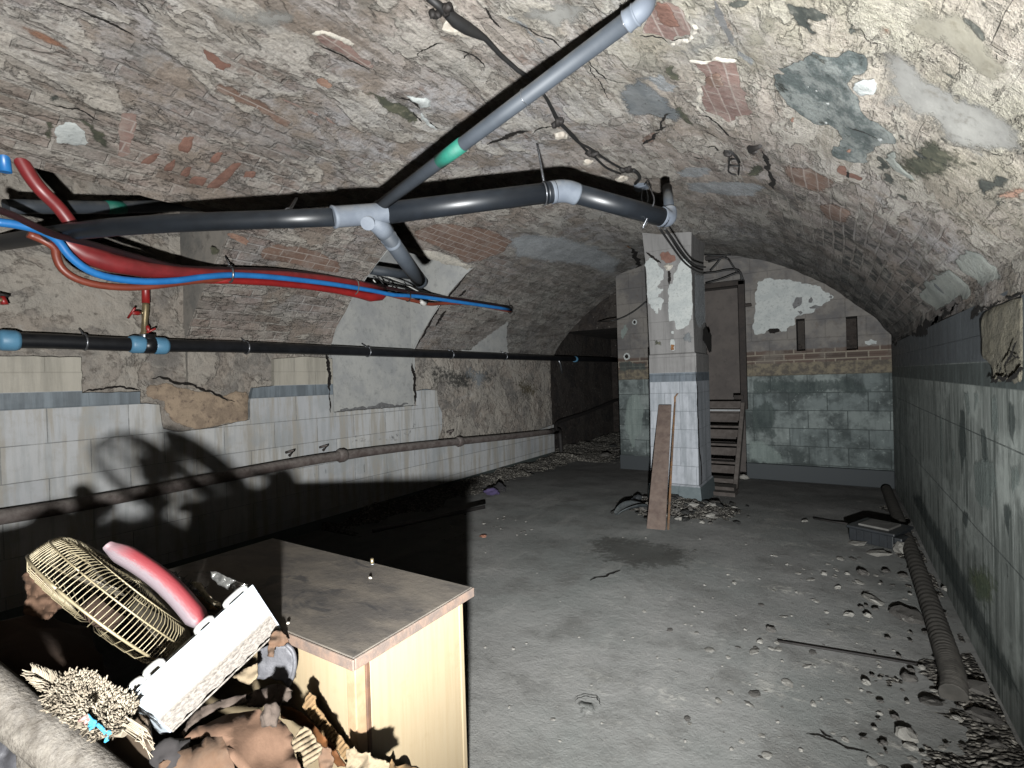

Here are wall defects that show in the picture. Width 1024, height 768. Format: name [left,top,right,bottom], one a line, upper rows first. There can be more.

flaking render [643,2,698,47]
flaking render [688,56,753,122]
peeling [54,122,88,146]
crack [643,113,672,144]
flaking render [774,50,914,193]
peeling [645,252,712,353]
peeling [752,278,834,335]
crack [325,271,470,413]
spalling [981,297,1023,384]
crack [85,376,235,402]
flaking render [146,383,249,429]
leakage [752,380,866,436]